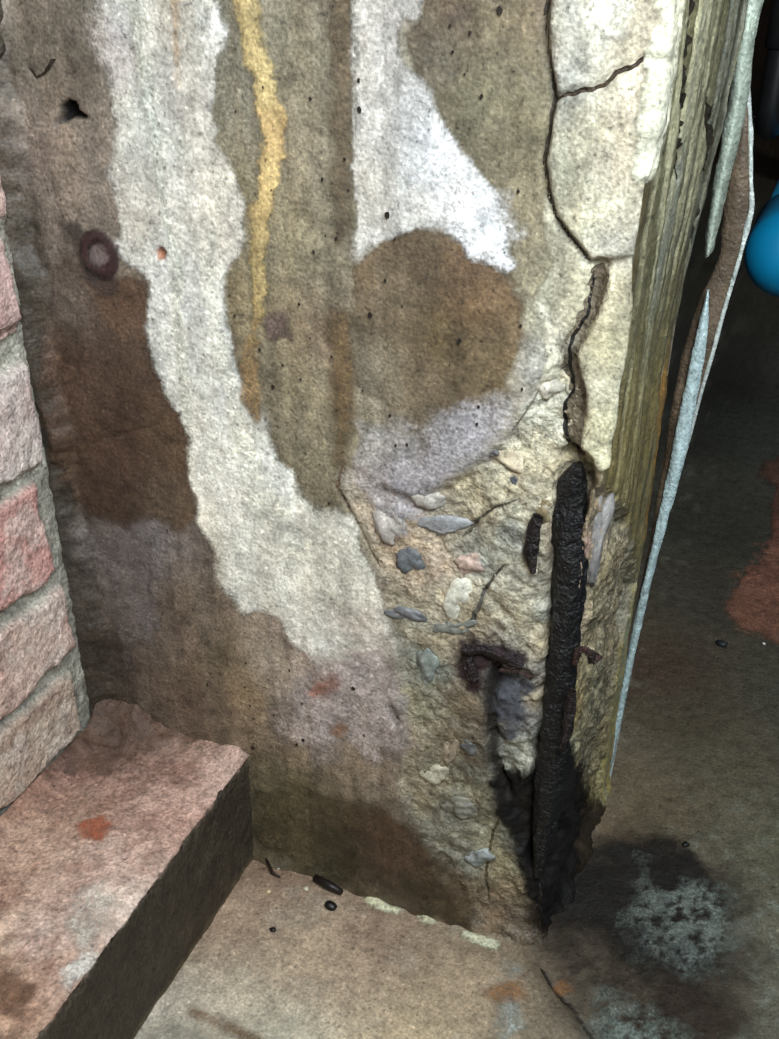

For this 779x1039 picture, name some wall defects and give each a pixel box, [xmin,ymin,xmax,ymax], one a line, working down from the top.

rust [62,222,119,298]
water stain [330,0,571,534]
crack [543,0,645,455]
water stain [38,0,406,763]
crack [512,389,539,432]
water stain [45,699,195,777]
water stain [252,784,500,950]
spalling [336,289,709,946]
rust [523,513,543,574]
rust [488,688,606,938]
rust [572,646,602,667]
water stain [539,836,744,1039]